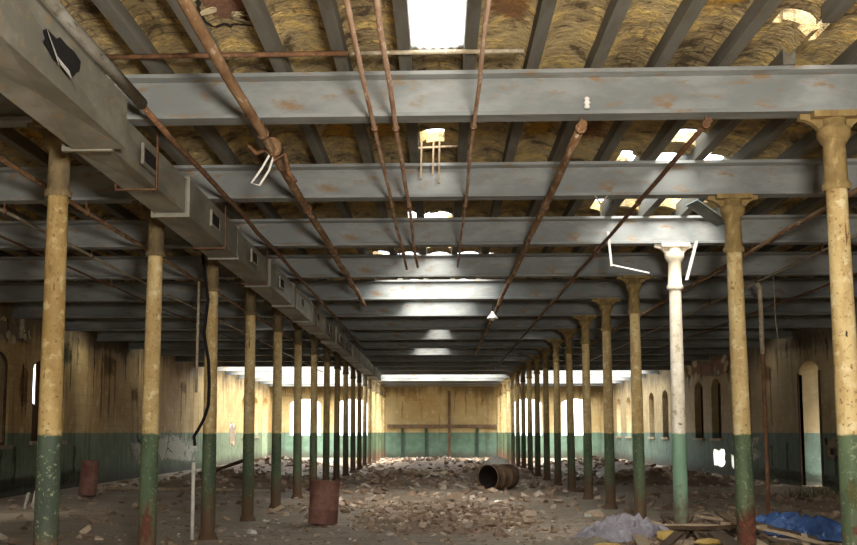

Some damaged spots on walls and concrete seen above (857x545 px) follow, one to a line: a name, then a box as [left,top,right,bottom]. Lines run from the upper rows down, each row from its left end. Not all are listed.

spalling [192,0,254,28]
flaking render [684,355,730,385]
peeling [158,429,202,463]